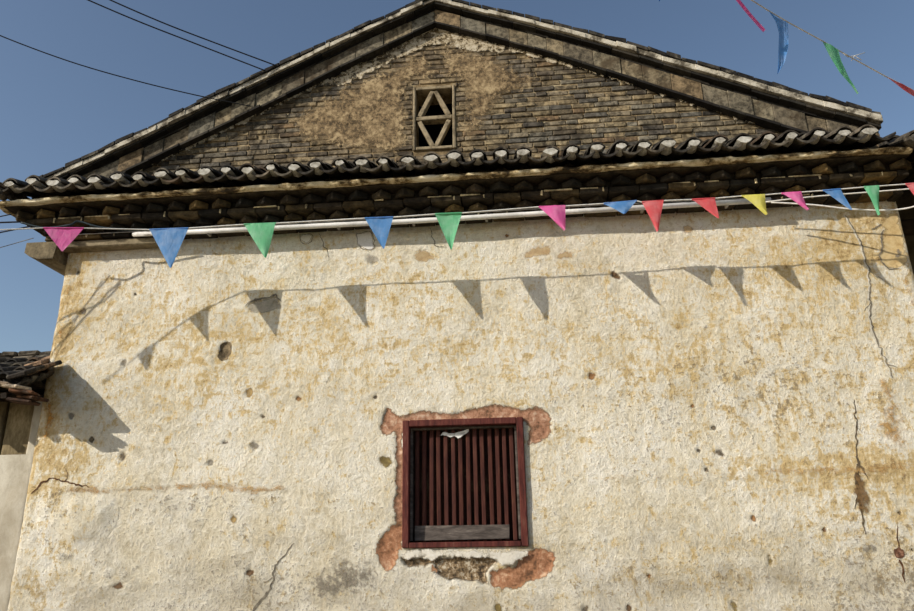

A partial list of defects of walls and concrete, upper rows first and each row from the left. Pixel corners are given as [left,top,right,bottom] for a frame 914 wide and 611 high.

spalling [419,104,453,147]
spalling [246,294,281,313]
crack [844,215,896,378]
spalling [218,341,232,361]
crack [31,468,88,494]
spalling [375,403,556,590]
crack [854,400,868,534]
crack [252,543,294,611]